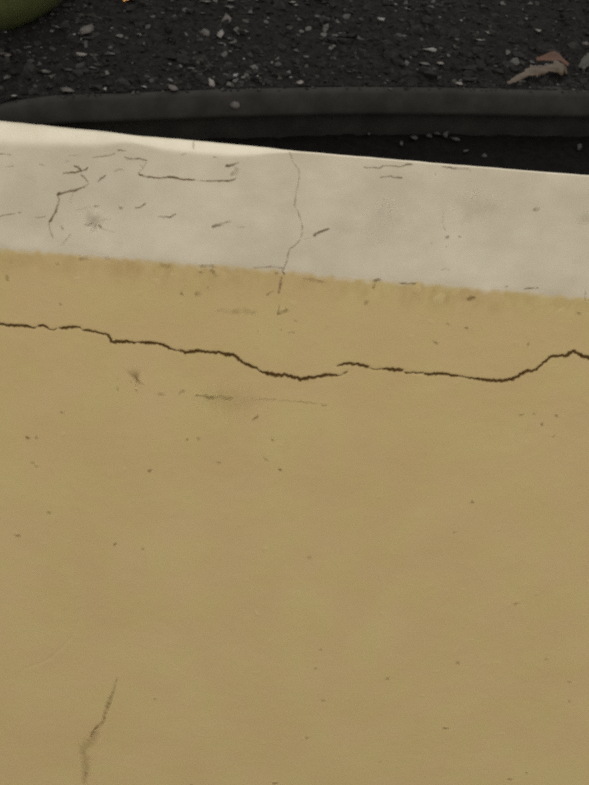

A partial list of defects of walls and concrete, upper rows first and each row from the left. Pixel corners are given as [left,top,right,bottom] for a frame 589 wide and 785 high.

crack [118,150,195,180]
crack [49,166,88,222]
crack [0,323,589,382]